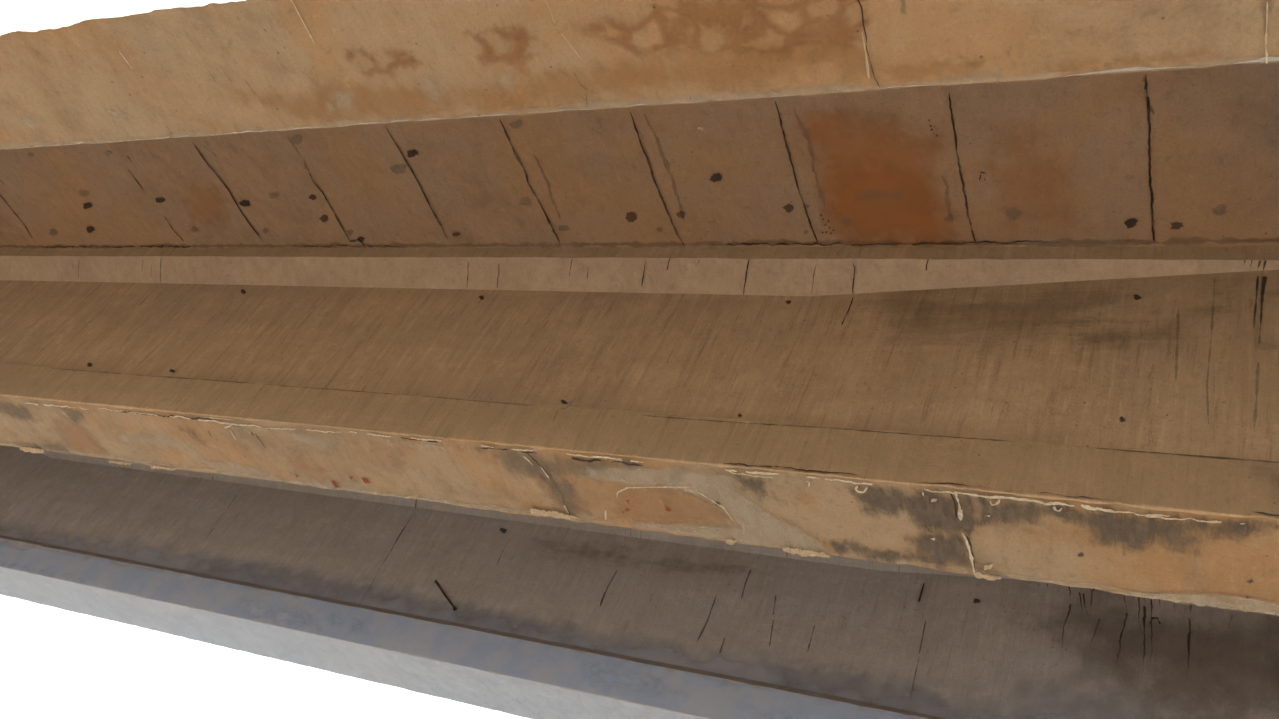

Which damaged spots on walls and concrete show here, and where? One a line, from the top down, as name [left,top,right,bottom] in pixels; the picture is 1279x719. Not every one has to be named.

crack [928,93,976,241]
crack [1144,75,1155,241]
water stain [0,529,959,719]
spalling [530,508,577,519]
peeling [617,486,733,521]
spalling [780,547,831,558]
water stain [588,469,1262,569]
spalling [973,572,1002,581]
water stain [1038,584,1279,698]